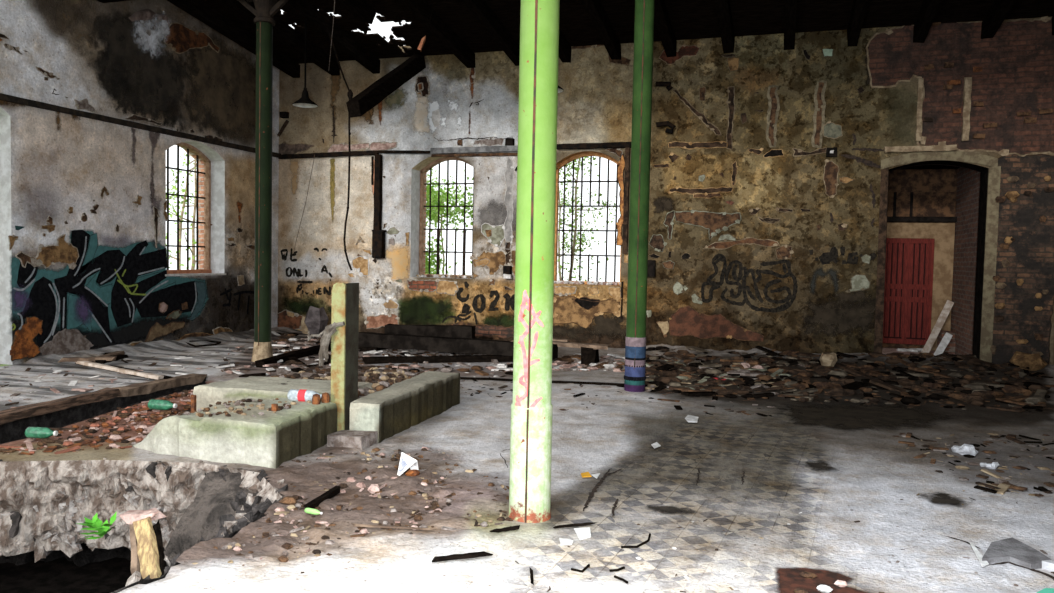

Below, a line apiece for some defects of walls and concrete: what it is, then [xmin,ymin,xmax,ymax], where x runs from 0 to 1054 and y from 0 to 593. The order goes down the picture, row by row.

spalling [164,22,220,54]
leakage [48,0,256,199]
spalling [8,185,109,269]
spalling [646,80,854,341]
spalling [857,16,1054,365]
flaking render [845,254,871,293]
spalling [10,316,94,361]